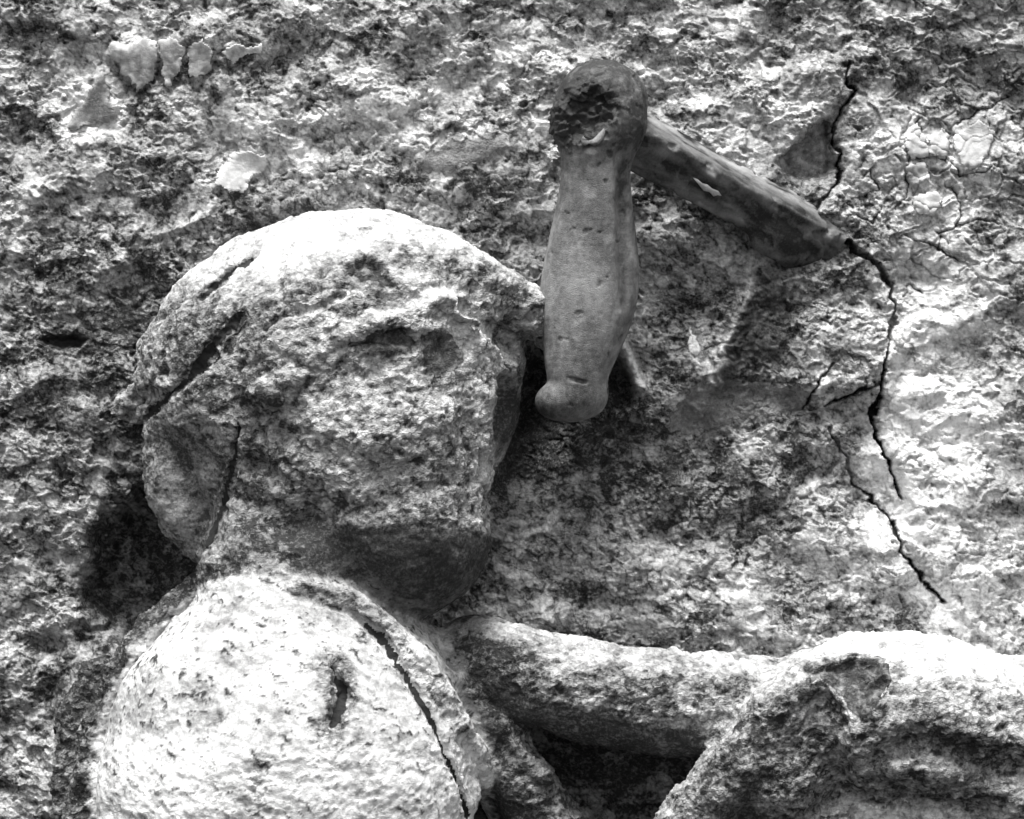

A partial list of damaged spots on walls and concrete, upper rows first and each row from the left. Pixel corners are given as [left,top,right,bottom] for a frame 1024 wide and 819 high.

crack [831,72,910,224]
crack [916,156,999,261]
crack [205,425,241,549]
crack [803,352,946,603]
crack [364,623,471,819]